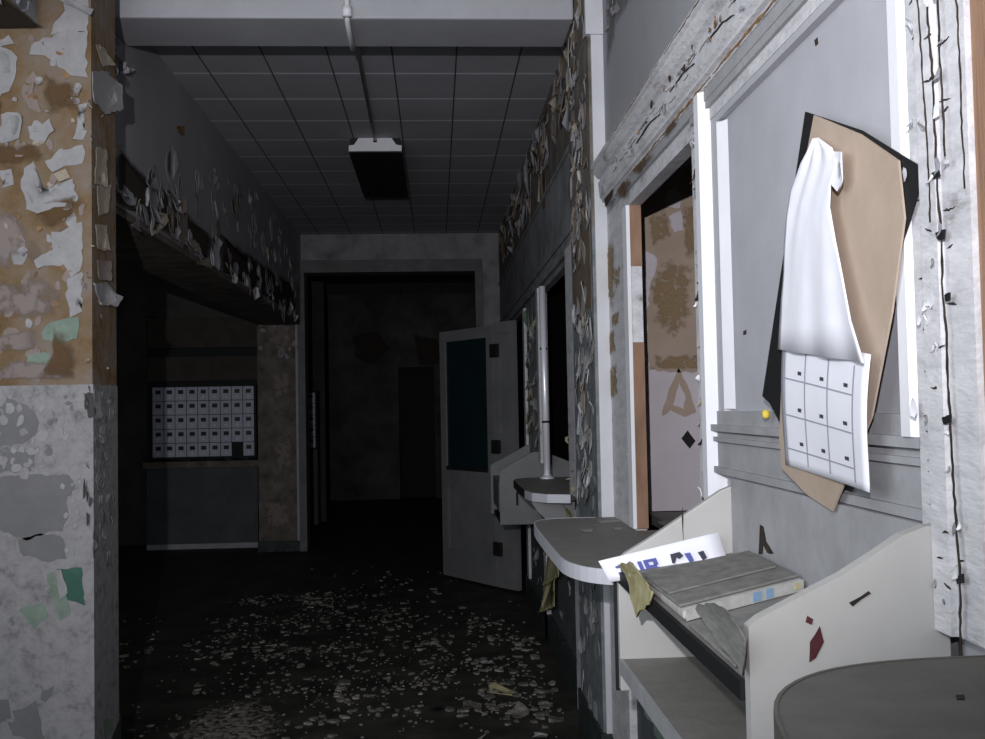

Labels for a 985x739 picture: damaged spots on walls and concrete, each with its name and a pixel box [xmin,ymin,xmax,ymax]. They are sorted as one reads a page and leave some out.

flaking render [0,371,115,628]
peeling [0,0,299,365]
peeling [498,0,605,518]
peeling [607,243,619,354]
peeling [610,365,618,397]
peeling [641,160,701,427]
crack [611,0,736,172]
peeling [925,157,950,185]
crack [909,0,966,656]
flaking render [0,686,54,739]